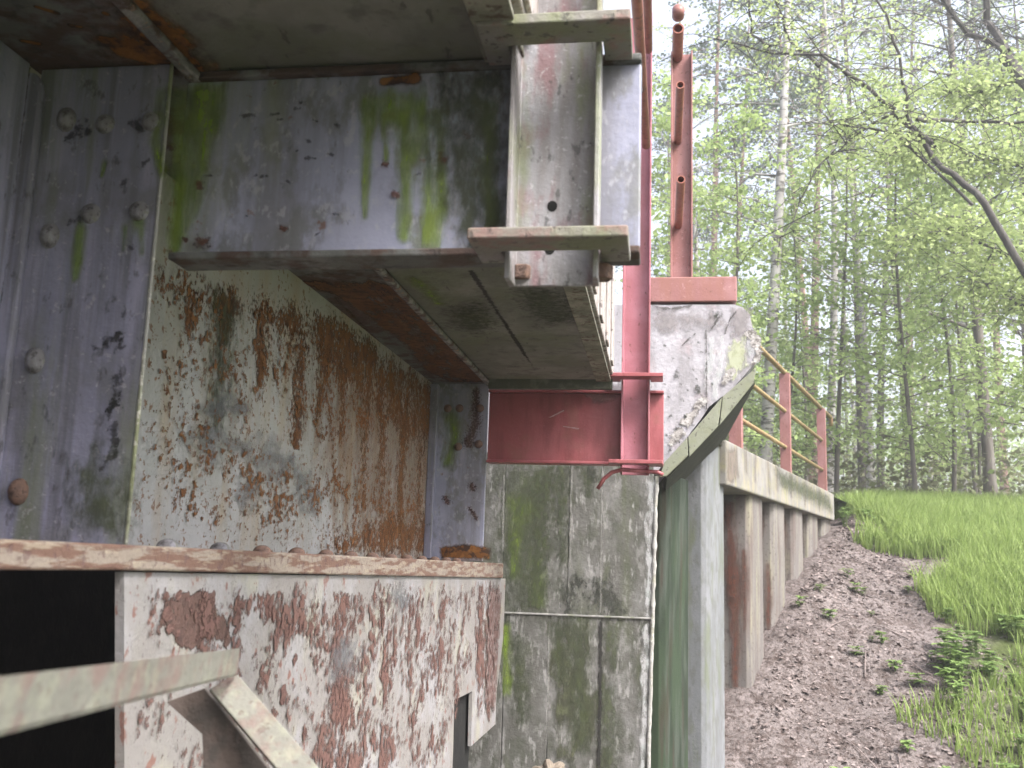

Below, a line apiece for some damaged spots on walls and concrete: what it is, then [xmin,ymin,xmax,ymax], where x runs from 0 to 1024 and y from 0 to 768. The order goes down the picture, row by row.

rust [89,3,177,74]
rust [133,0,217,72]
leakage [362,100,370,218]
leakage [399,71,509,248]
rust [155,265,431,558]
rust [461,386,483,449]
rust [440,544,491,560]
leakage [528,465,626,768]
peeling [137,693,172,738]
peeling [143,579,499,768]
leakage [503,626,531,725]